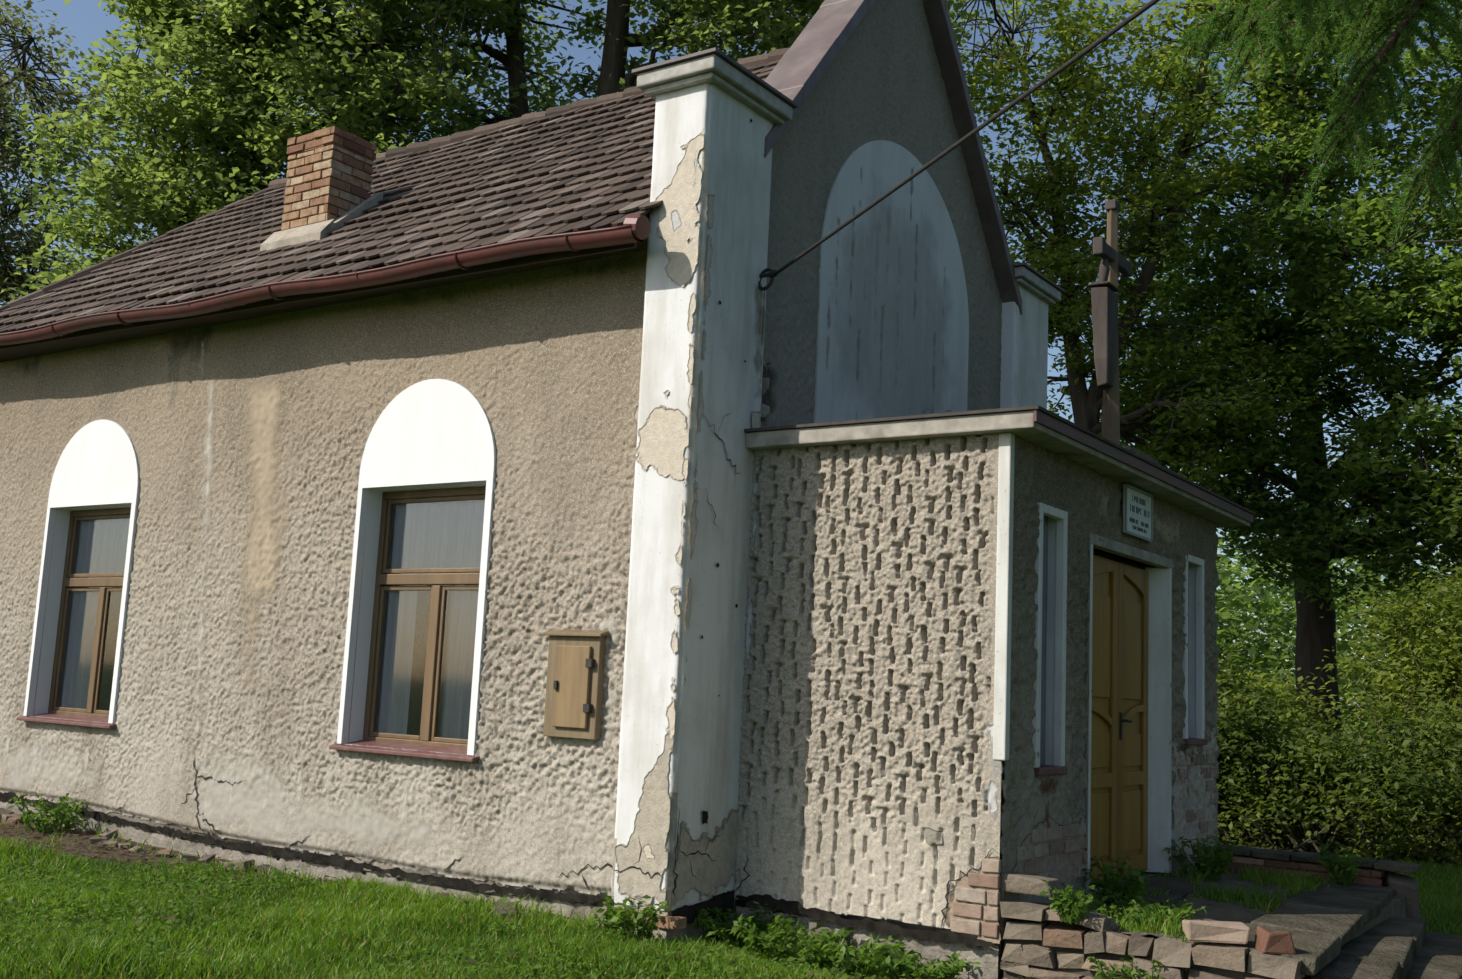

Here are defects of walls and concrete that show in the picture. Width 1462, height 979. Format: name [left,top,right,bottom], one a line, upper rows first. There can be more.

peeling [634,129,721,659]
crack [0,759,996,949]
peeling [611,677,739,931]
flaking render [941,815,1088,944]